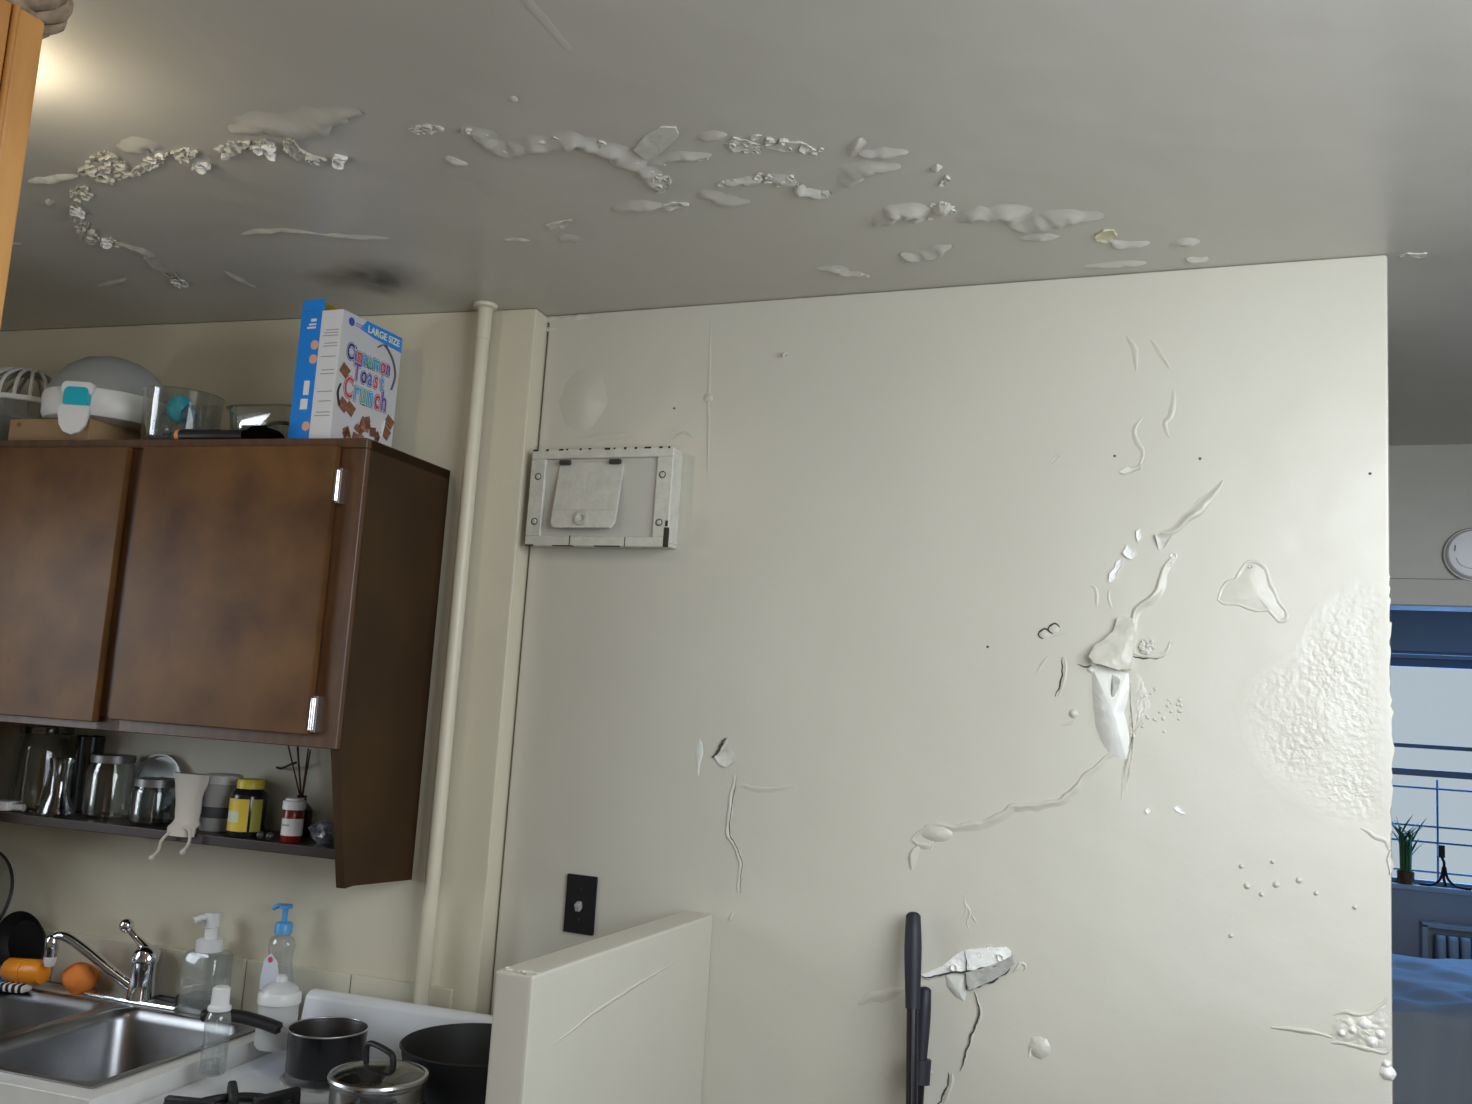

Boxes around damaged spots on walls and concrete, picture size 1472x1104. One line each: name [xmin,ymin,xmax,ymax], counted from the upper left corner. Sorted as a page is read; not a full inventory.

peeling [69,106,364,249]
peeling [408,124,444,135]
peeling [445,155,468,166]
crack [1036,656,1067,697]
crack [725,775,794,922]
spalling [921,945,1027,1104]